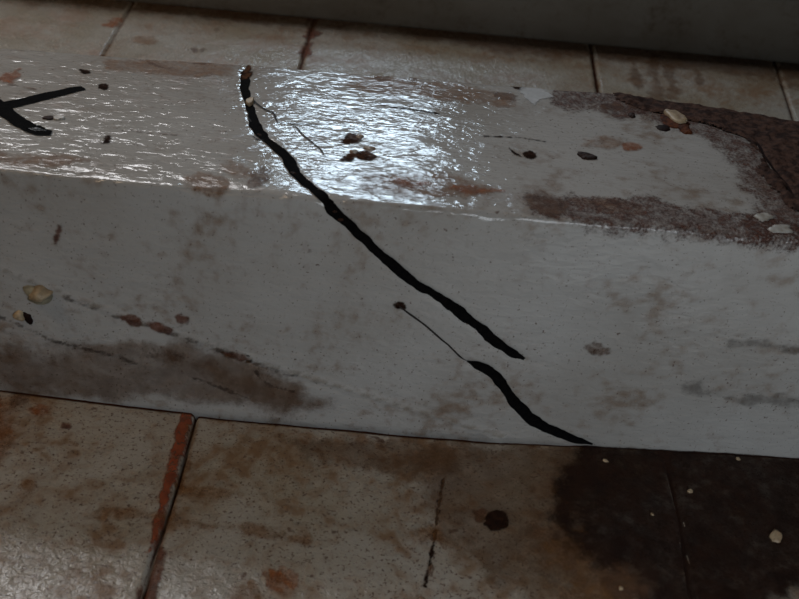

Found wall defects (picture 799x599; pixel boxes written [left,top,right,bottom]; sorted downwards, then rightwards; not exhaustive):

crack [239,65,593,445]
spalling [531,92,799,252]
corrosion [137,413,192,599]
leakage [551,446,799,599]